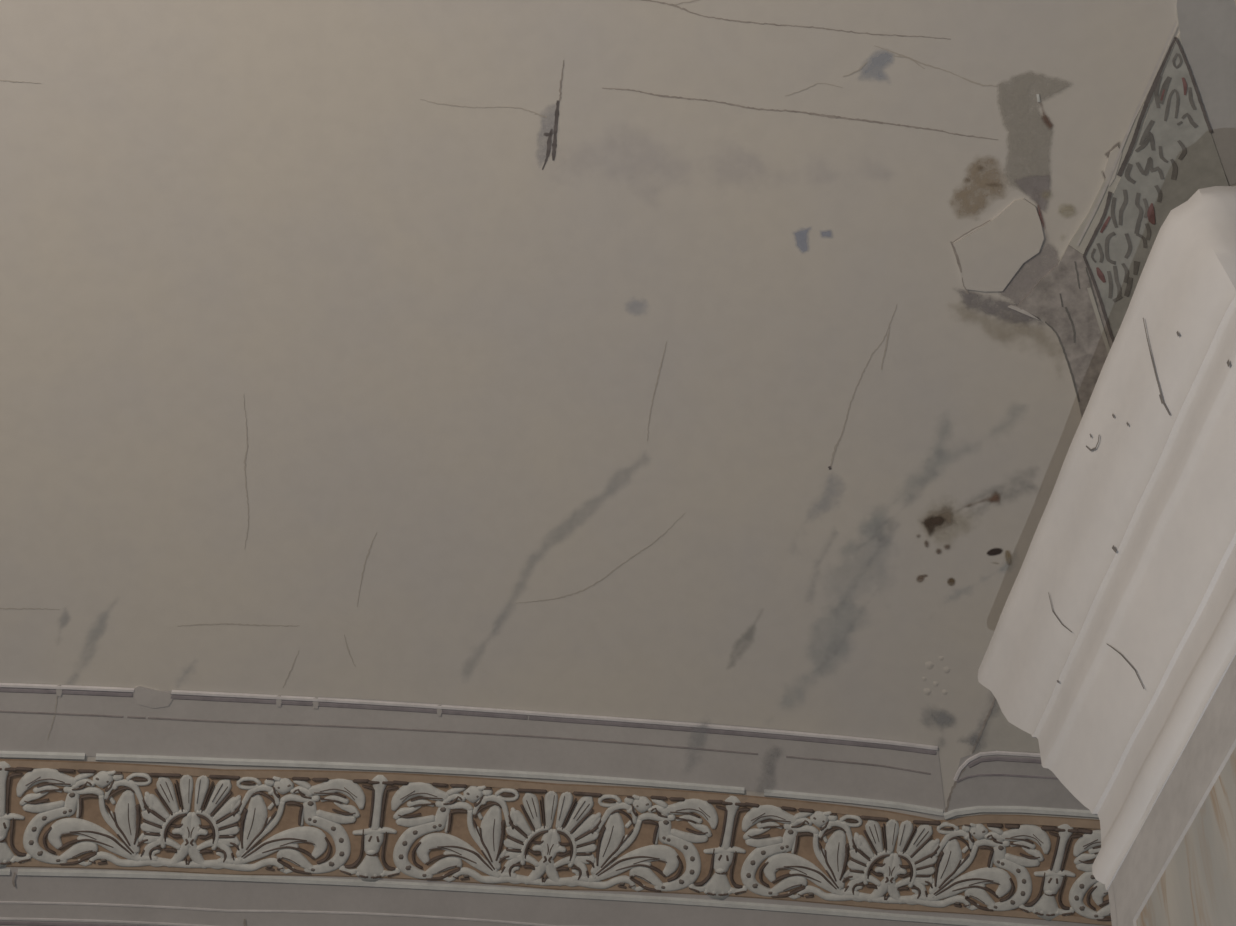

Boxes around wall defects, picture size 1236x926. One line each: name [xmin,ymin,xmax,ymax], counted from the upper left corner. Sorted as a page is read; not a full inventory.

crack [420,60,564,170]
crack [603,0,998,140]
peeling [950,73,1068,322]
crack [828,305,897,470]
leakage [924,511,951,553]
leakage [987,548,1011,564]